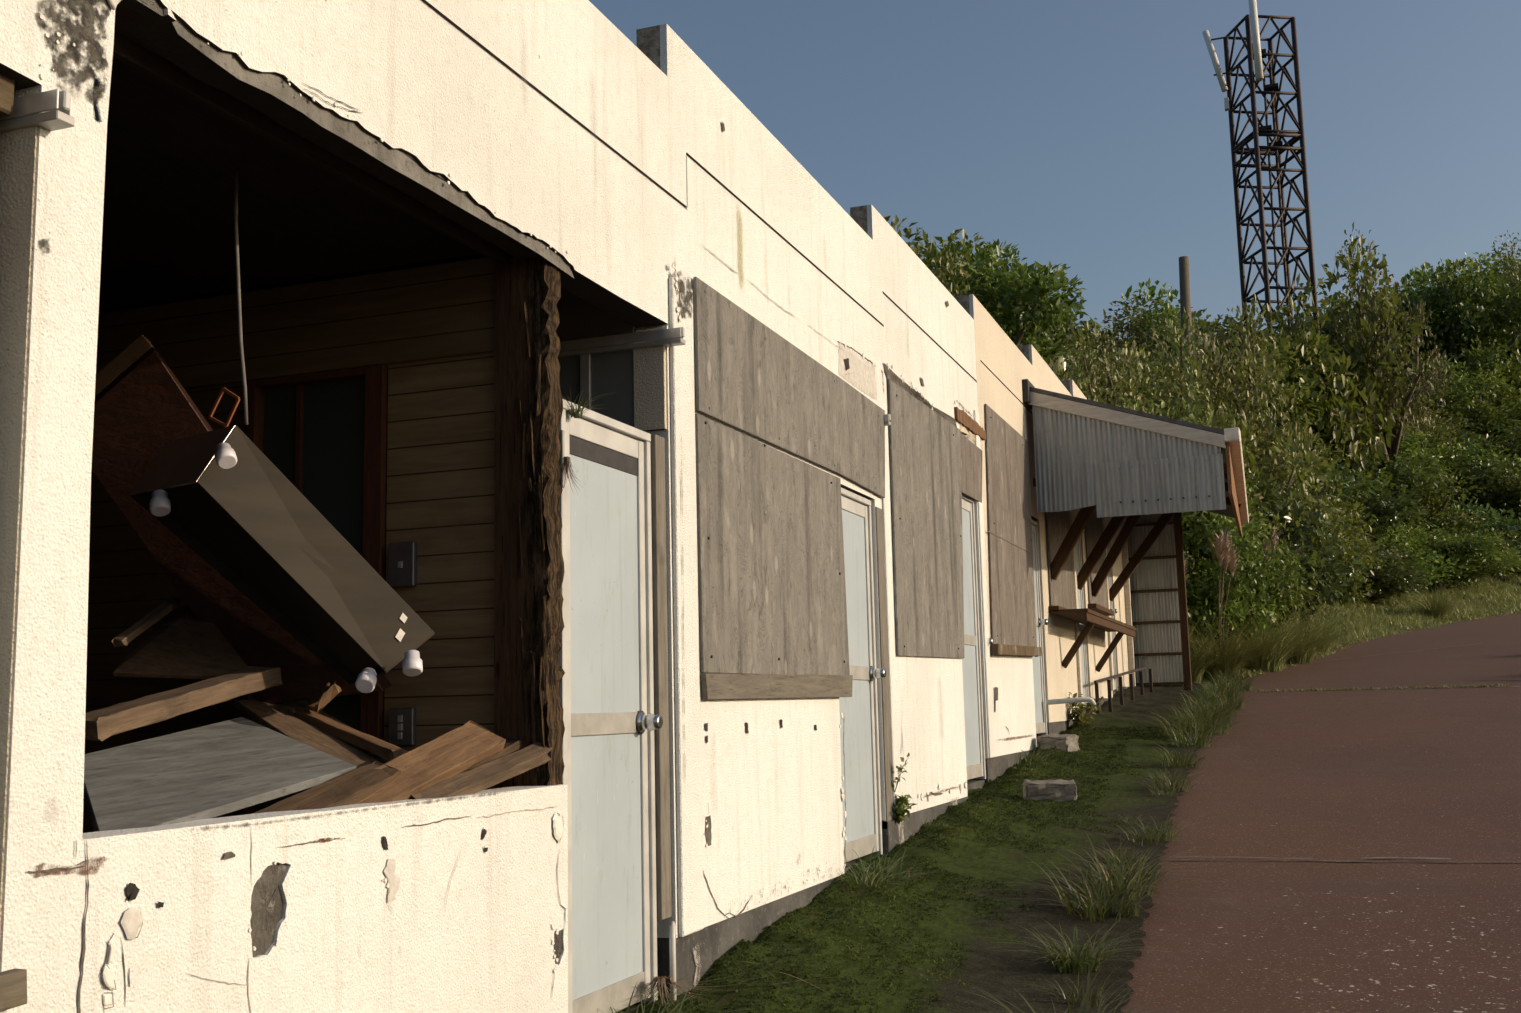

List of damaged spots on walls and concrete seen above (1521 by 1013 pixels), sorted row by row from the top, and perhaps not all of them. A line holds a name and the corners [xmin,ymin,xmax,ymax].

spalling [107,0,574,278]
rust [28,857,105,877]
crack [76,840,89,1013]
spalling [248,861,287,957]